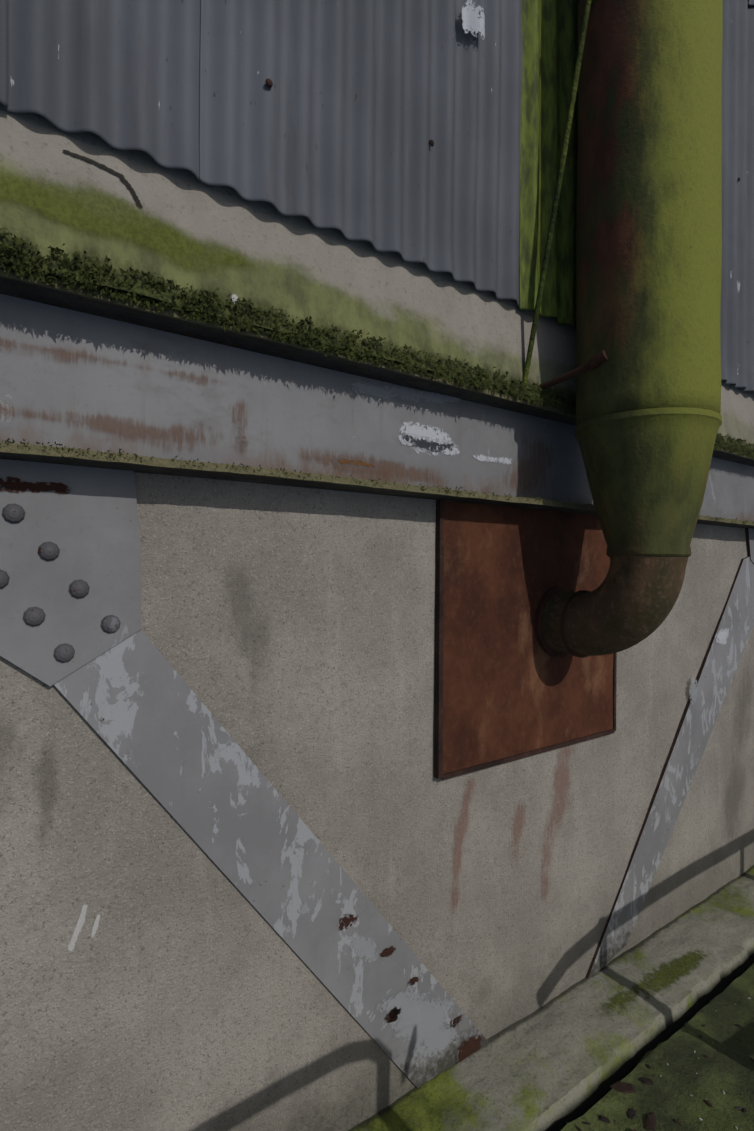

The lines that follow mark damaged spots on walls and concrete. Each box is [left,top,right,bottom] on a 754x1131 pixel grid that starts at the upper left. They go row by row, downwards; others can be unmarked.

corrosion [0,476,71,494]
peeling [376,987,457,1058]